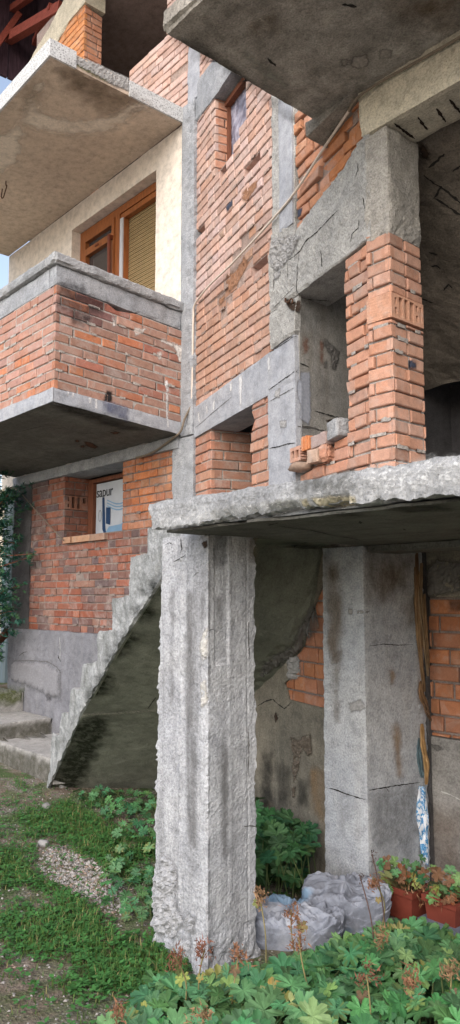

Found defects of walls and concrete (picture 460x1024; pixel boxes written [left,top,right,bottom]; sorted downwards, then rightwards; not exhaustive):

crack [424,154,460,215]
crack [273,165,365,306]
spalling [284,298,301,312]
peeling [363,459,460,493]
spalling [163,492,362,526]
damp [0,710,156,788]
crack [326,782,460,800]